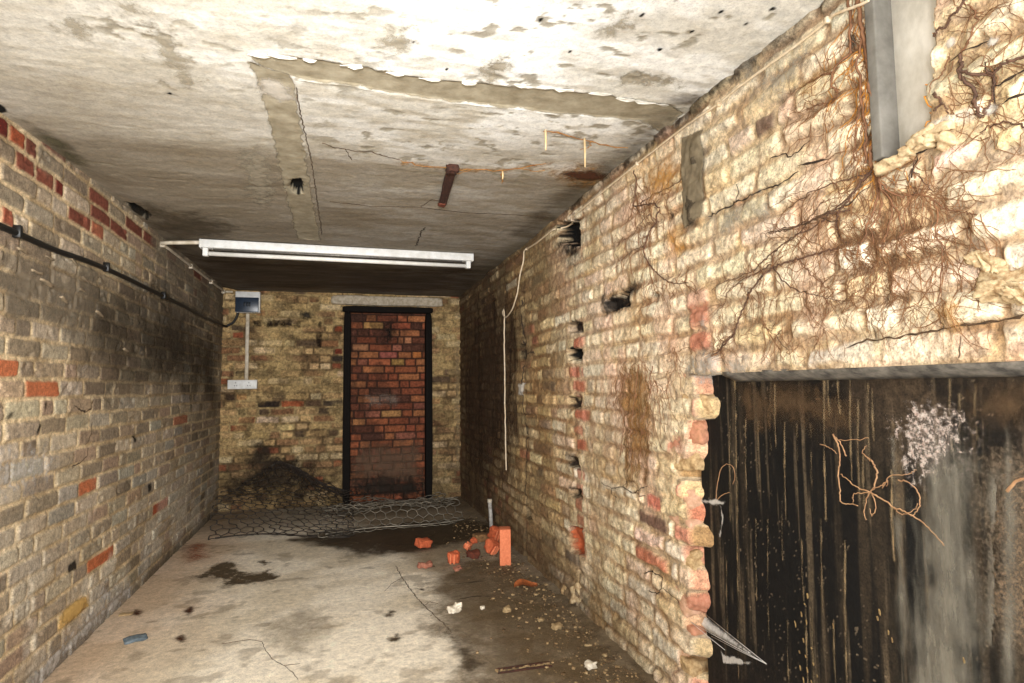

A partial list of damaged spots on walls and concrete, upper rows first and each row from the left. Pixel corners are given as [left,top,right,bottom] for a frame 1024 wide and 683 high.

peeling [248,53,317,63]
peeling [462,57,512,86]
peeling [621,72,673,86]
peeling [588,92,669,106]
crack [296,87,628,246]
corrosion [551,162,605,187]
crack [708,141,831,217]
crack [847,311,1024,358]
spalling [570,346,584,361]
damp [895,406,1024,683]